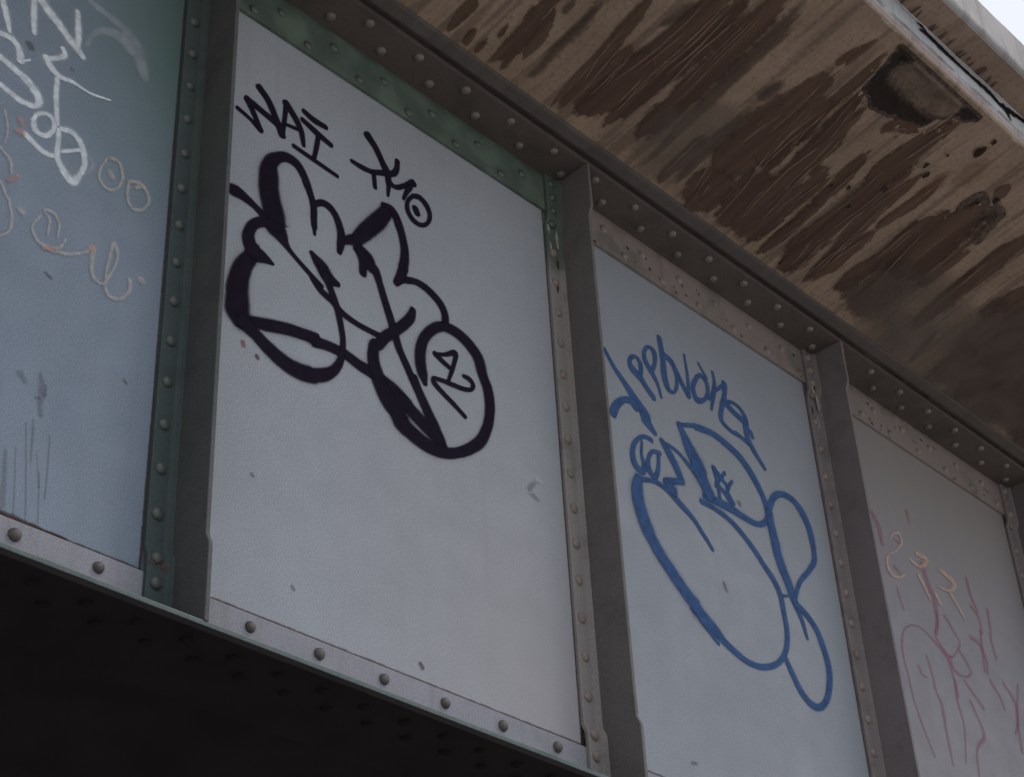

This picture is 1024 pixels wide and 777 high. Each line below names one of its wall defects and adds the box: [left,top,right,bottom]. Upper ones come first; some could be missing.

damp [447,0,598,76]
spalling [857,44,982,139]
crack [917,22,1024,123]
damp [551,0,1024,361]
spalling [956,192,1006,245]